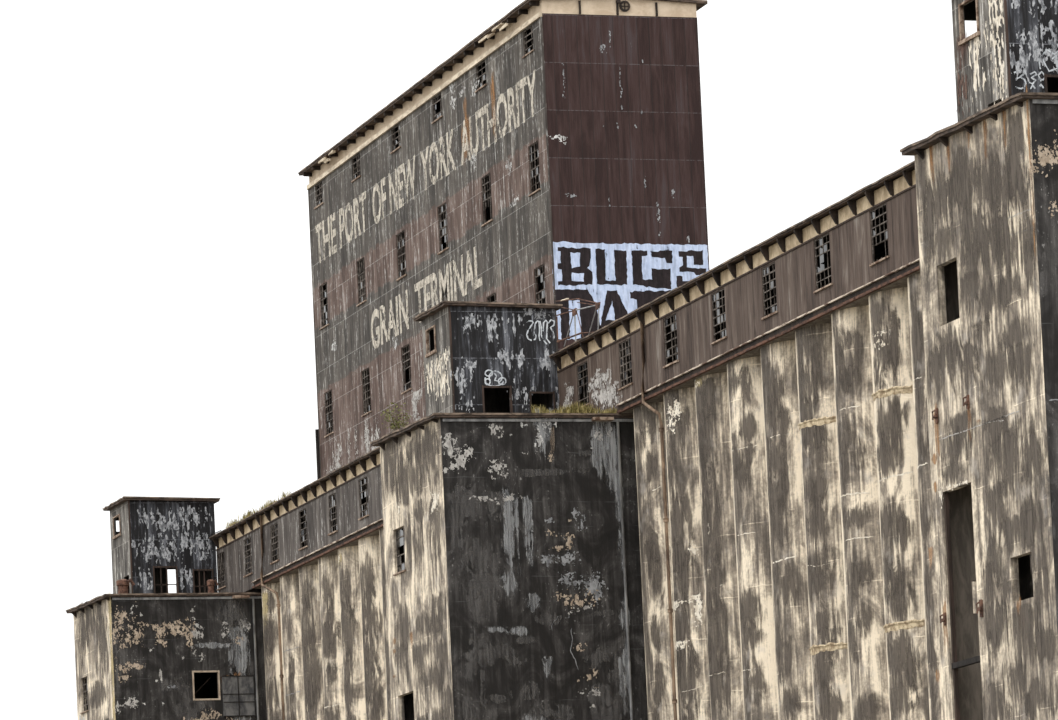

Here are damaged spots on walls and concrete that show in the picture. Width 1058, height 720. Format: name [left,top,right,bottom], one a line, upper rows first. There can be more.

peeling [968,0,1058,111]
peeling [1030,129,1058,177]
peeling [440,433,476,474]
peeling [488,459,509,479]
peeling [469,493,523,505]
peeling [538,507,609,615]
peeling [111,605,206,683]
peeling [221,618,251,647]
peeling [115,696,146,712]
spalling [183,708,238,720]